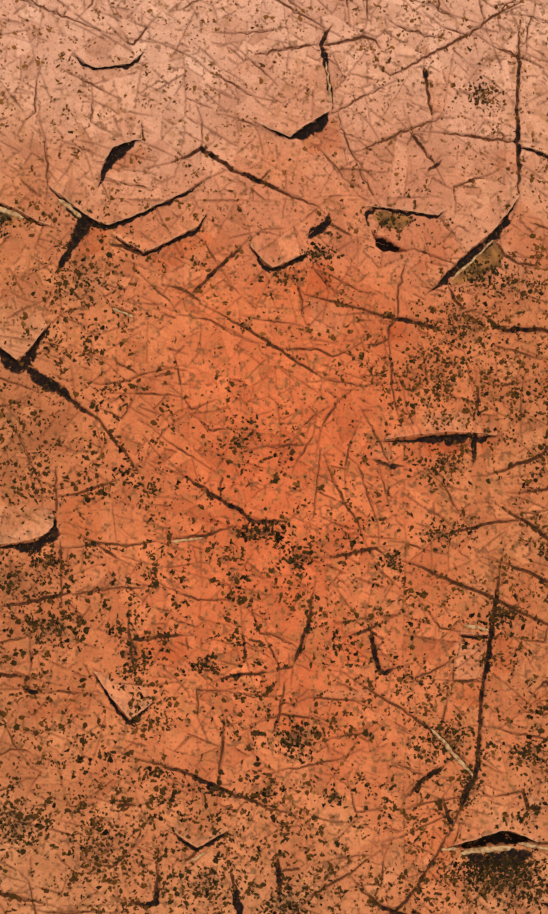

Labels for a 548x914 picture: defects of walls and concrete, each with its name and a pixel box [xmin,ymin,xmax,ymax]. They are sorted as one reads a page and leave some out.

peeling [240,26,379,140]
crack [325,0,548,195]
peeling [49,120,207,271]
crack [172,123,317,206]
peeling [250,214,351,271]
spalling [373,235,400,252]
peeling [432,184,519,291]
crack [155,244,452,558]
peeling [0,469,63,602]
crack [196,593,345,732]
crack [302,544,548,914]
crack [230,868,244,914]